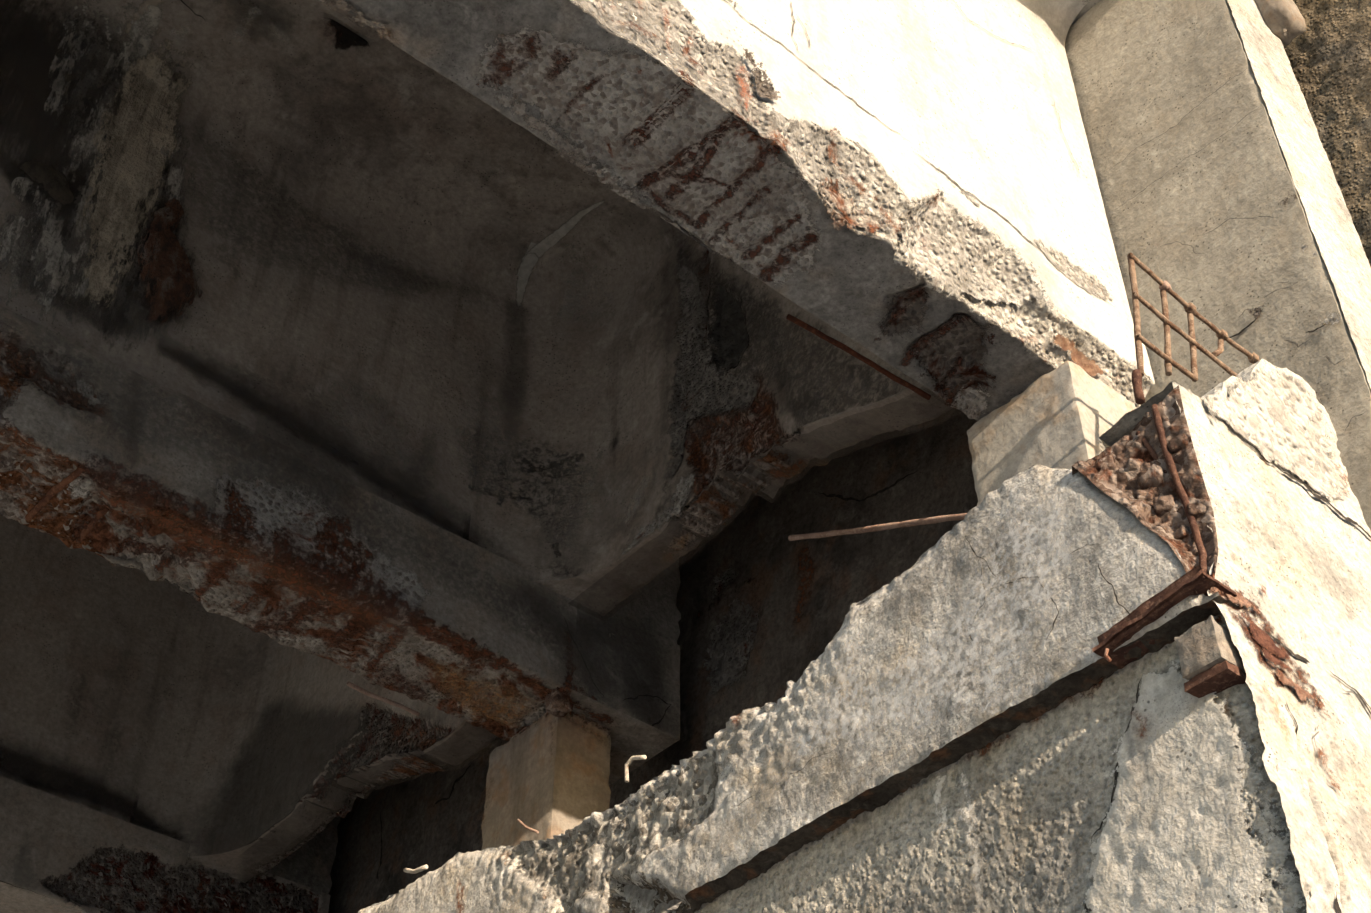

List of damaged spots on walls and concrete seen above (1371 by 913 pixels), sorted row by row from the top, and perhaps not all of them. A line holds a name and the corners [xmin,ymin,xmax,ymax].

leakage [161,346,473,543]
spalling [476,0,1219,595]
rust [1132,369,1145,405]
crack [1231,427,1371,538]
spalling [0,322,552,913]
rust [70,455,614,737]
rust [1068,564,1329,716]
spalling [497,751,721,913]